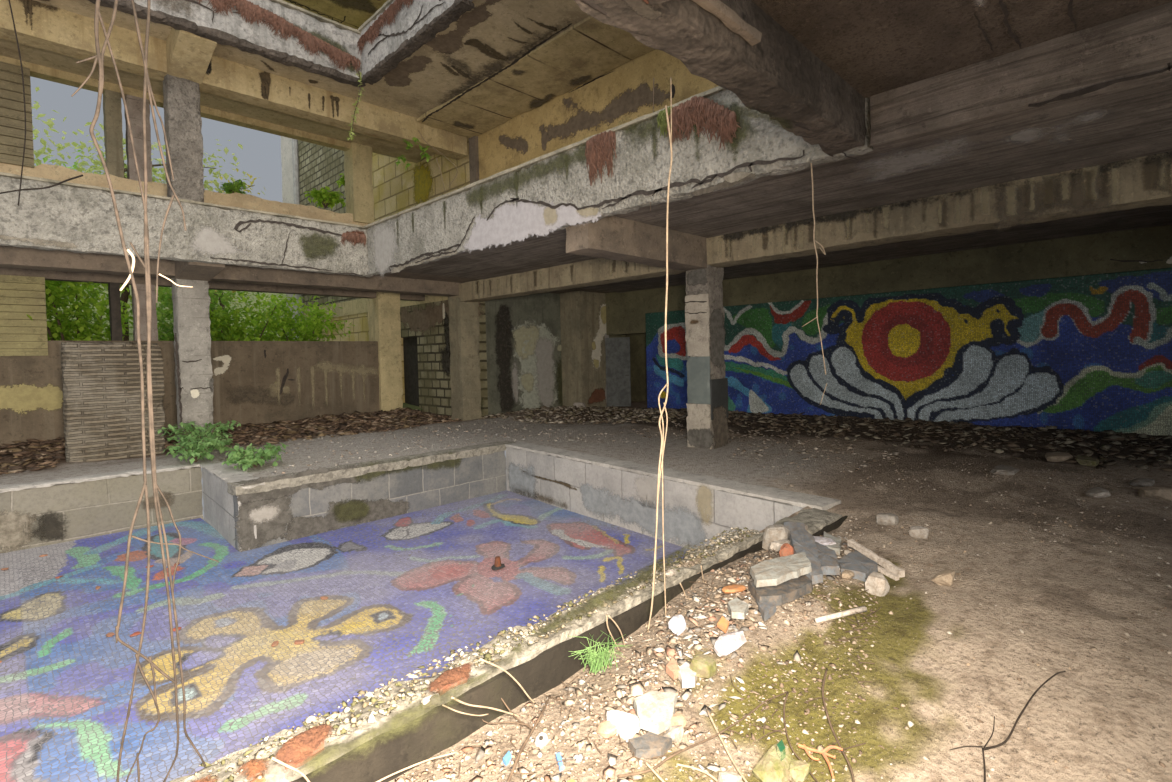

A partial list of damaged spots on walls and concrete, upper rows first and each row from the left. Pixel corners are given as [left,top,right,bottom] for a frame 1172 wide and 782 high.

leakage [441,22,569,103]
leakage [529,94,555,108]
crack [1028,63,1172,107]
flaking render [391,199,601,273]
crack [210,124,816,277]
leakage [466,143,587,210]
peeling [511,319,561,410]